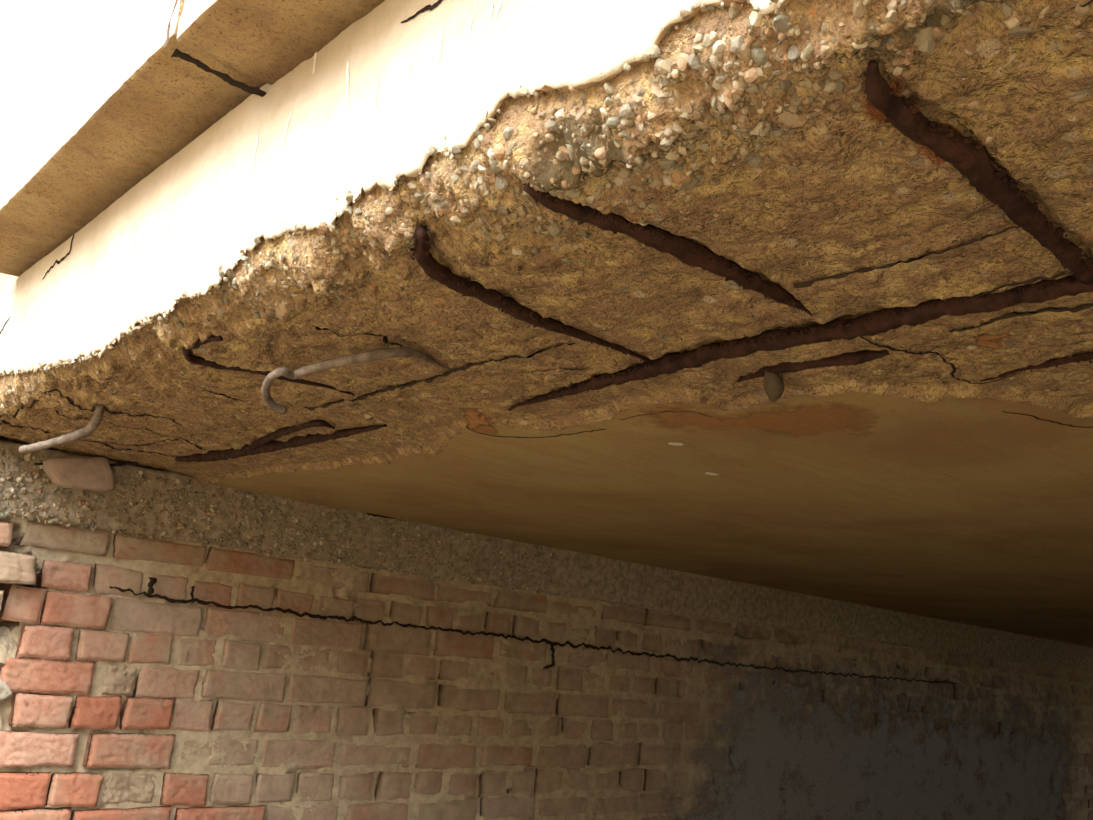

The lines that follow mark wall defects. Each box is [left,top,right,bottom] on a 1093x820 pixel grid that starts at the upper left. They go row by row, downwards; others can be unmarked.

crack [163,0,267,97]
crack [401,0,442,23]
spalling [0,0,1093,484]
crack [1003,411,1093,428]
crack [109,577,957,685]